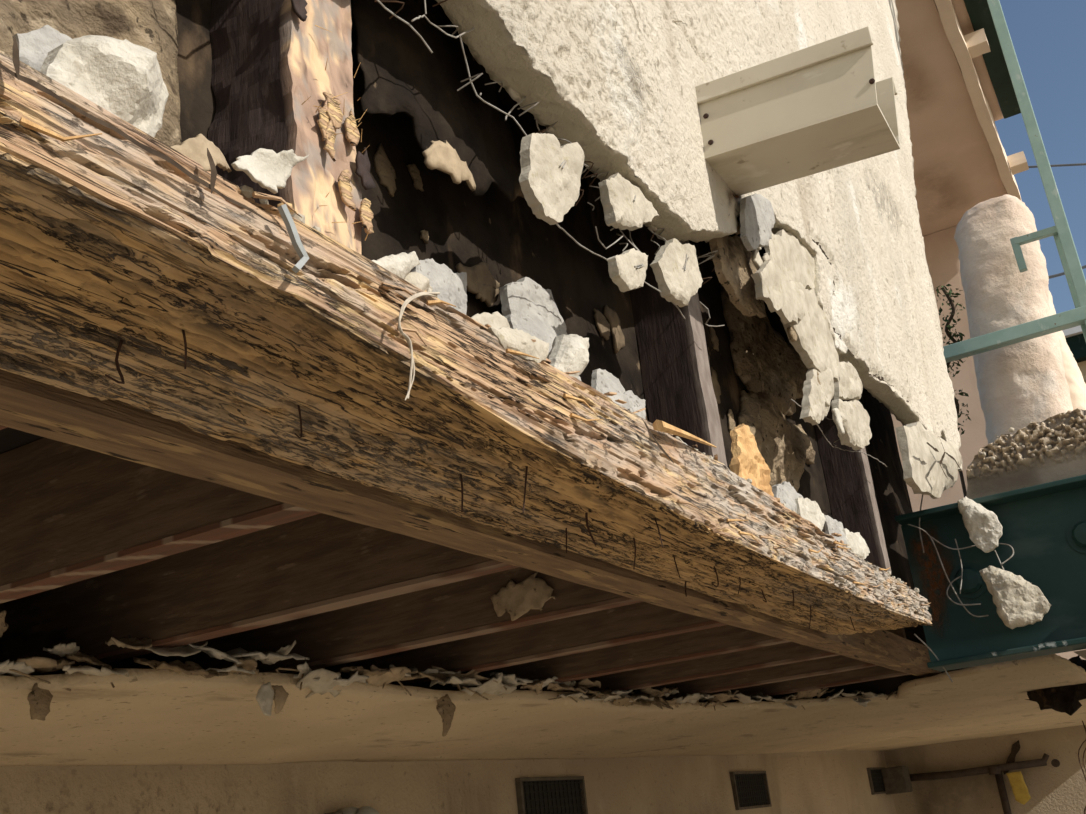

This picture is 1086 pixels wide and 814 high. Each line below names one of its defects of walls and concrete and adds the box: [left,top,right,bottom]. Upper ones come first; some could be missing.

peeling [291,0,307,22]
spalling [506,87,522,103]
peeling [317,92,377,234]
peeling [471,311,510,329]
peeling [709,193,845,435]
corrosion [912,529,952,626]
peeling [0,610,8,637]
peeling [0,635,898,737]
spalling [1026,655,1086,716]